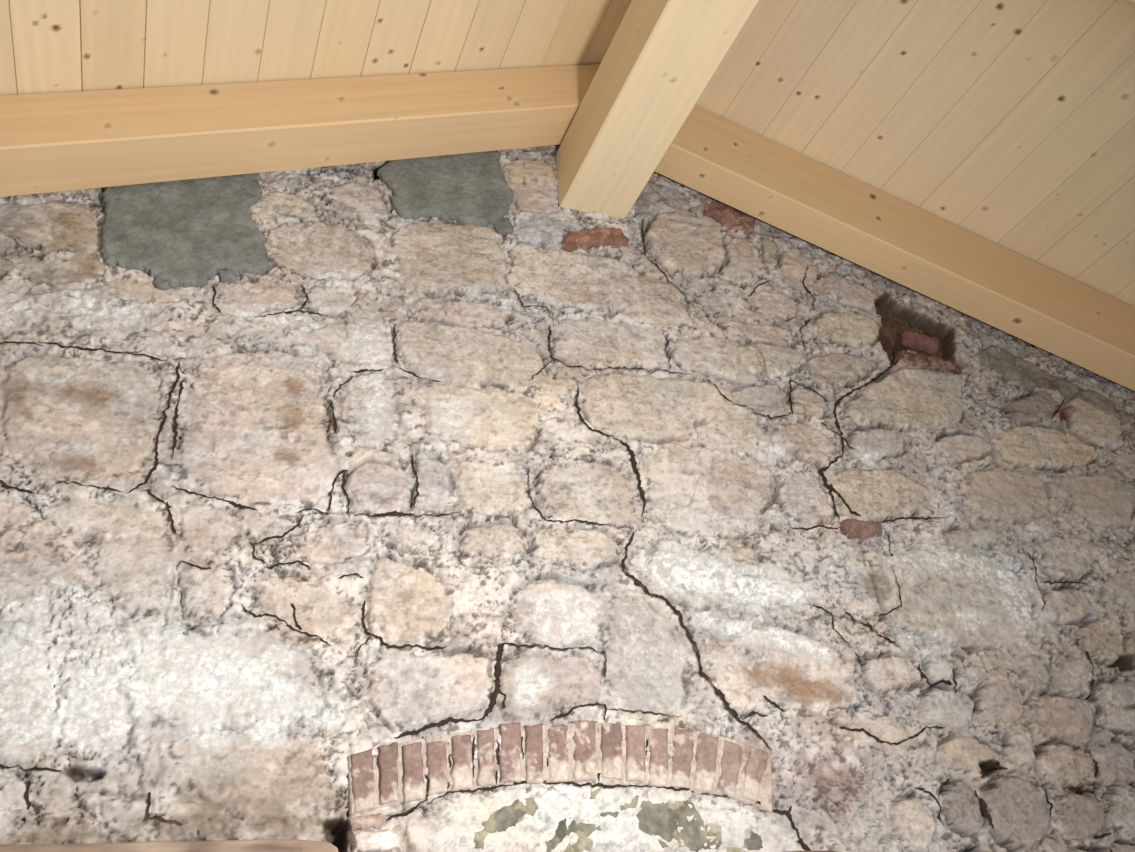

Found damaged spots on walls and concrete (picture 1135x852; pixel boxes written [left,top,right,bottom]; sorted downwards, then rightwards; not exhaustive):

crack [642,219,695,307]
crack [329,324,441,435]
spalling [875,303,962,375]
crack [0,341,258,534]
crack [251,451,462,570]
crack [514,289,946,750]
crack [241,573,447,663]
crack [918,664,957,694]
crack [386,642,811,851]
crack [916,778,949,825]